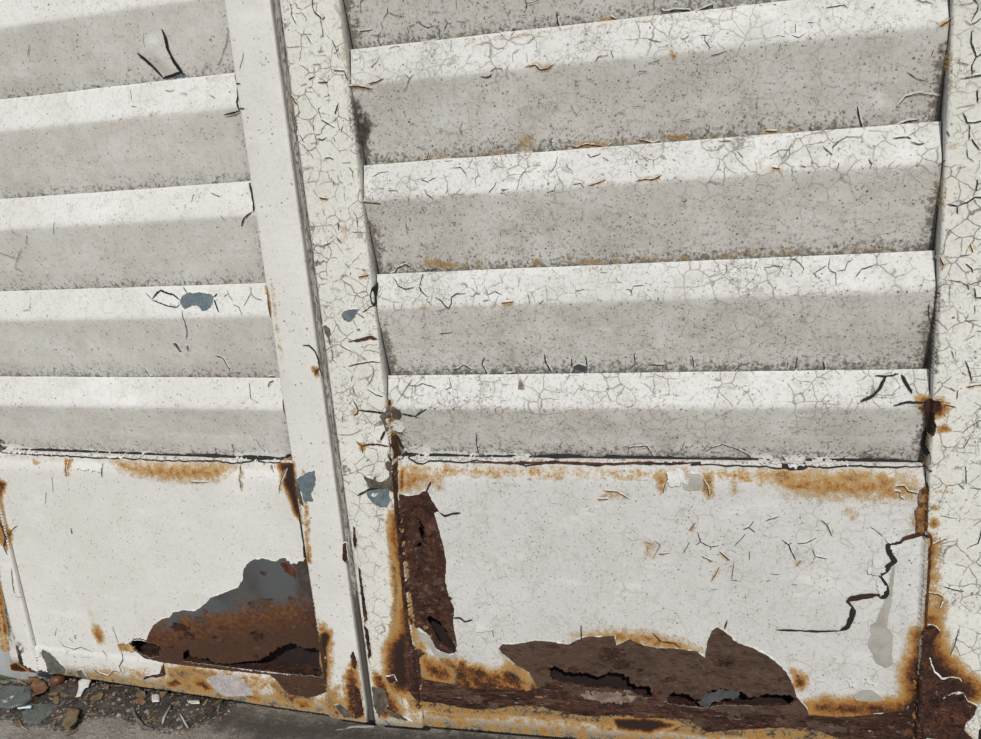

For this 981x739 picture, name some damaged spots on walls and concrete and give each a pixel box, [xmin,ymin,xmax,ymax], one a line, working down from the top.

crack [290,0,613,340]
crack [809,106,865,169]
peeling [146,287,219,352]
crack [860,237,981,408]
rust [915,394,952,470]
rust [276,457,312,563]
peeling [296,470,317,506]
crack [303,344,981,633]
rust [701,468,918,519]
peeling [117,551,327,697]
rust [61,505,981,739]
peeling [497,621,809,718]